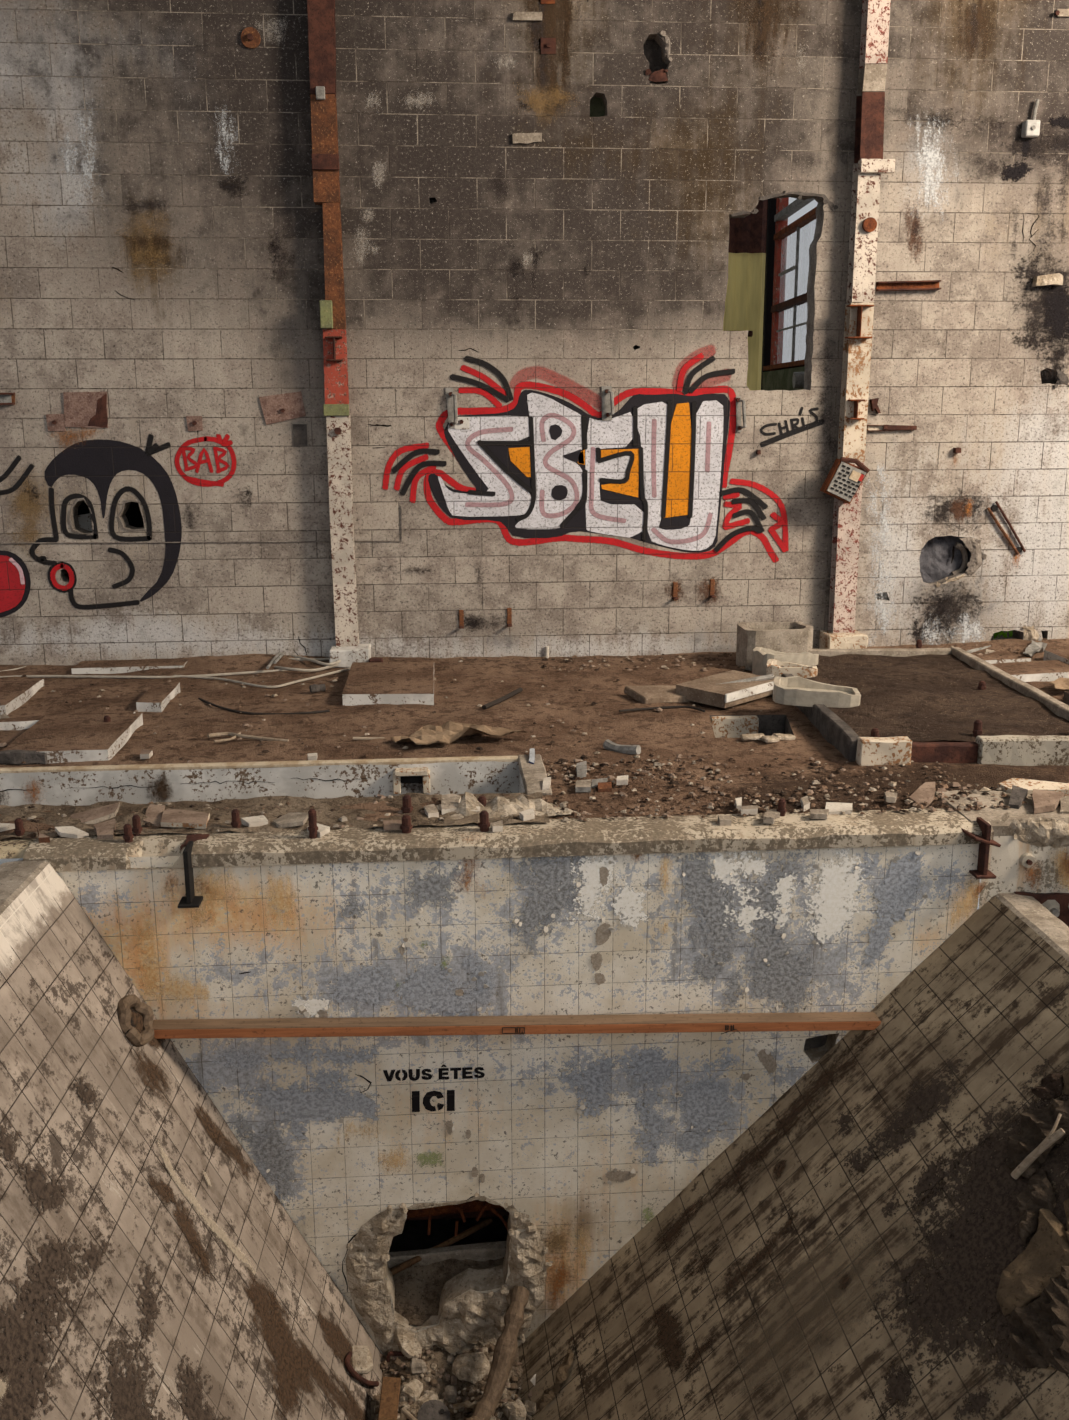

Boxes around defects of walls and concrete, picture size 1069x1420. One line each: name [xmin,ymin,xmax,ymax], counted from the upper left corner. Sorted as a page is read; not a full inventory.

water stain [525,0,572,104]
water stain [737,0,790,67]
water stain [946,0,993,59]
water stain [1036,177,1066,246]
water stain [1047,351,1064,375]
water stain [870,467,896,630]
spalling [936,537,986,587]
water stain [908,599,981,644]
peeling [443,1120,471,1139]
spalling [346,1167,552,1362]
rust [549,1236,586,1306]
spalling [345,1351,379,1387]